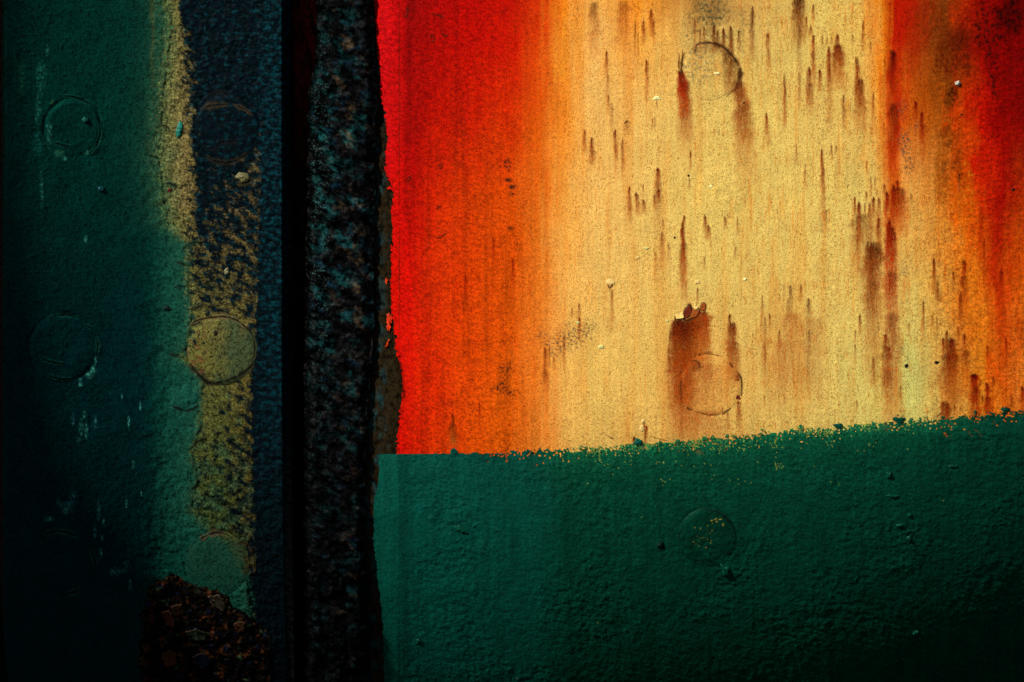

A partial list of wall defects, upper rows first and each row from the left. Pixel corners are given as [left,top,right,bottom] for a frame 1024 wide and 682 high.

corrosion [678,51,690,117]
corrosion [694,21,748,124]
corrosion [792,0,874,115]
corrosion [883,51,898,167]
corrosion [628,168,660,209]
corrosion [854,180,904,331]
corrosion [668,311,712,415]
corrosion [726,314,736,362]
corrosion [873,316,895,375]
corrosion [941,330,965,434]
corrosion [970,373,990,416]
spalling [138,573,270,682]